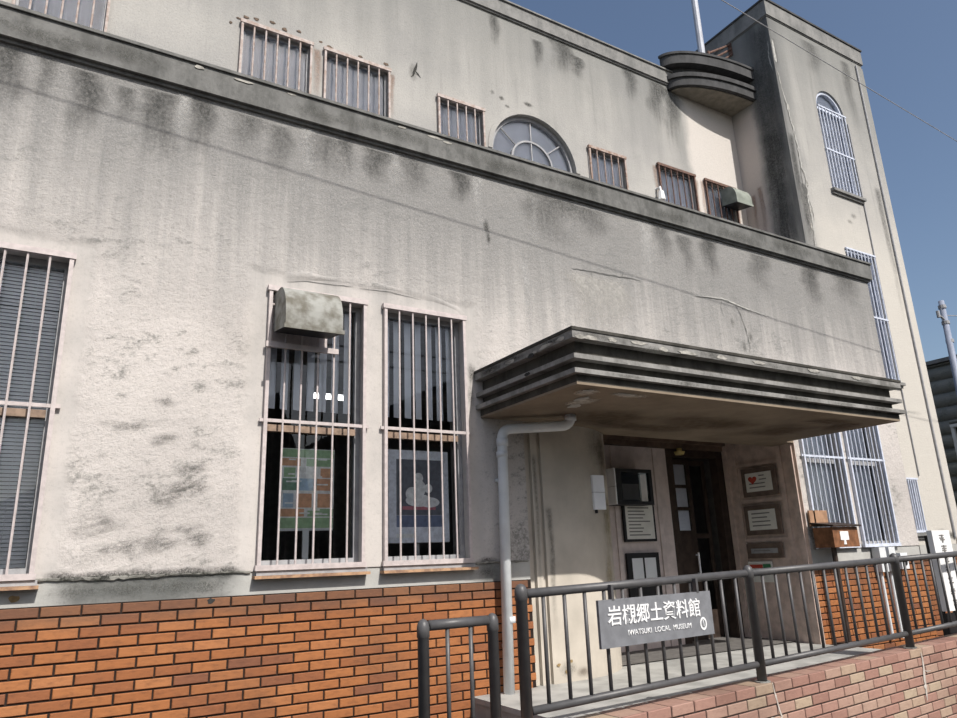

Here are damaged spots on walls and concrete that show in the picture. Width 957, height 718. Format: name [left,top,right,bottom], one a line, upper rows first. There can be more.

crack [572,268,640,281]
crack [694,295,769,344]